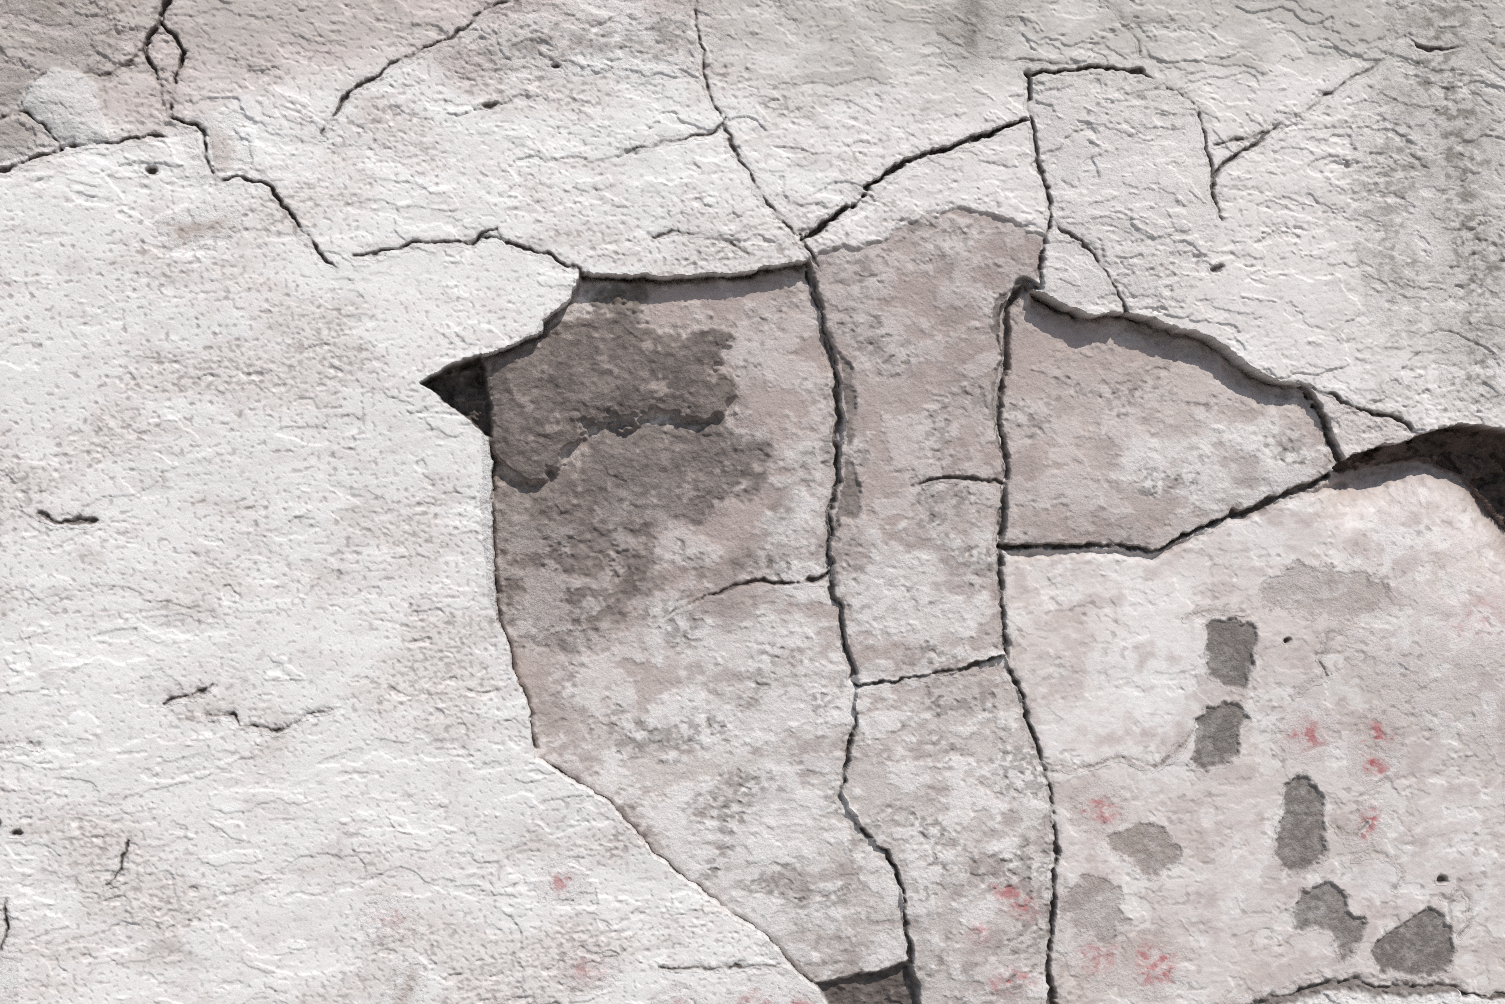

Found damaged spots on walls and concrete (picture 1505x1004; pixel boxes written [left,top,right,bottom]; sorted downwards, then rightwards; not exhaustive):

crack [0,0,590,284]
water stain [584,265,665,324]
spalling [441,201,1413,947]
crack [618,0,1505,1004]
crack [0,896,12,962]
water stain [1066,778,1130,843]
water stain [1271,703,1405,855]
peeling [1272,769,1474,979]